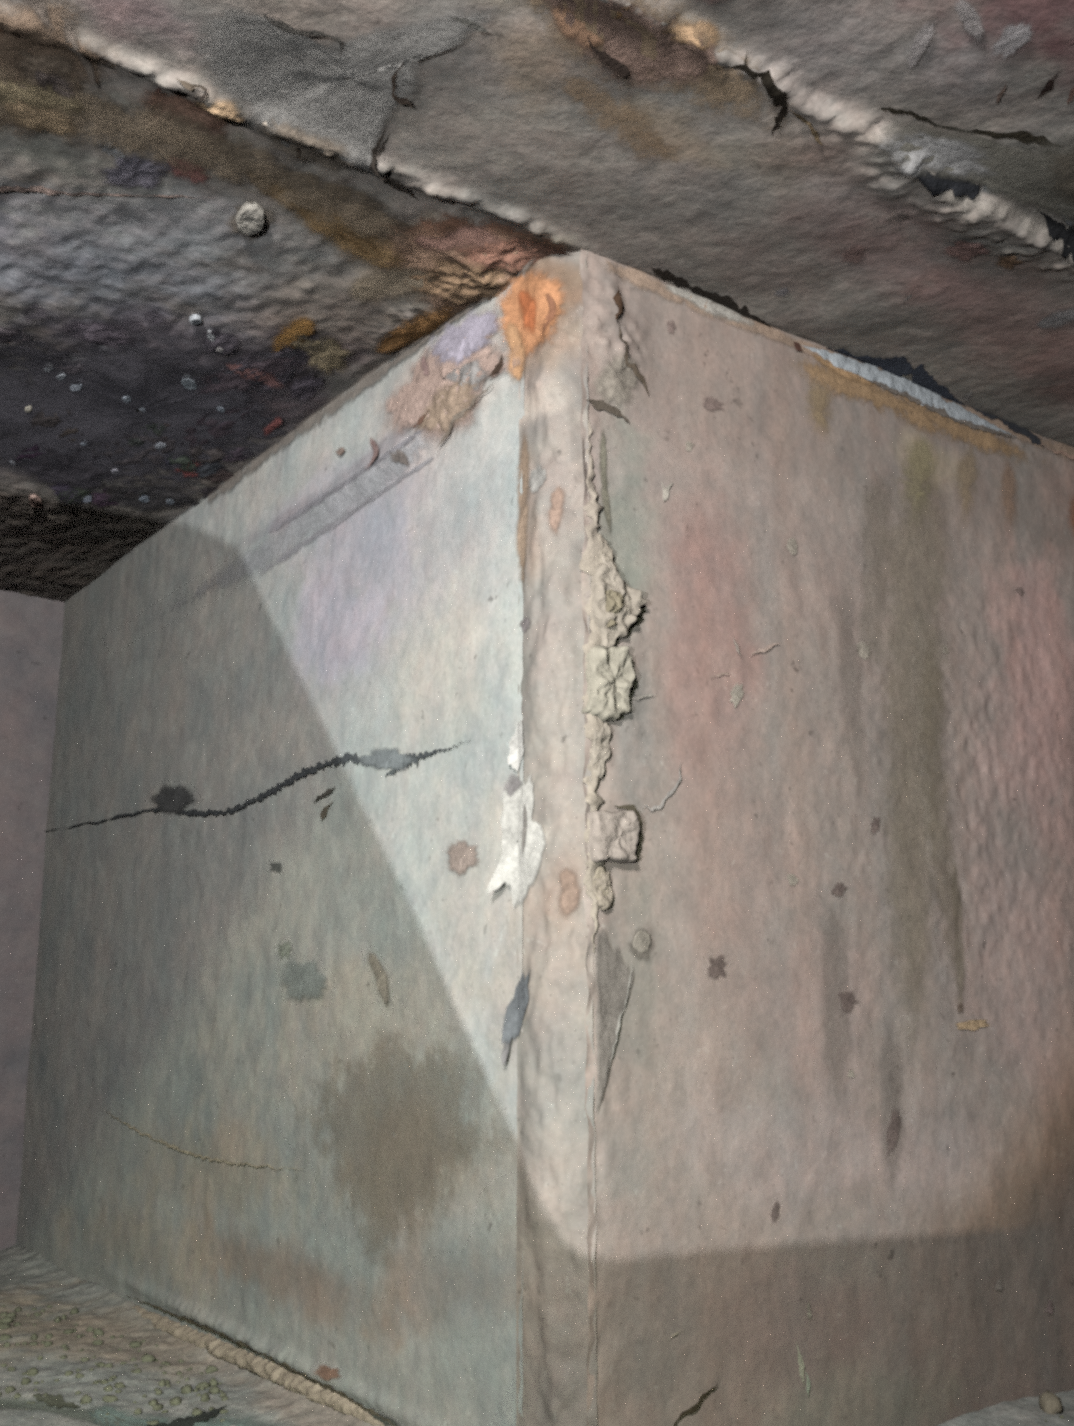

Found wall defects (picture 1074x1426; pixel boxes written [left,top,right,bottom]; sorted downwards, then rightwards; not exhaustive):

peeling [195,8,490,198]
crack [713,53,823,145]
crack [878,70,1074,147]
rust [0,0,570,502]
crack [885,152,1074,265]
crack [46,740,470,831]
peeling [487,721,545,906]
crack [673,1380,719,1426]